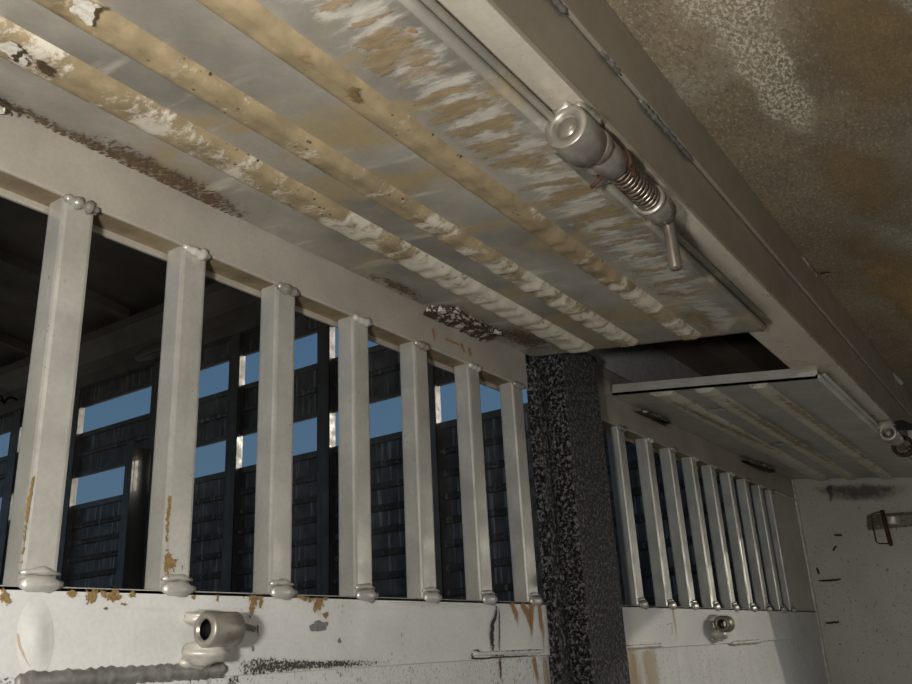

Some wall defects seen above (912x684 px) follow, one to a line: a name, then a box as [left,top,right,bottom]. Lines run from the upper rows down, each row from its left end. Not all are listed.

peeling [69,0,101,26]
water stain [319,0,356,11]
peeling [0,41,30,65]
water stain [350,11,447,83]
corrosion [3,100,247,218]
water stain [412,82,596,206]
water stain [572,204,646,244]
peeling [423,311,496,342]
corrosion [164,496,176,576]
corrosion [66,589,136,610]
corrosion [249,595,263,618]
corrosion [510,602,544,639]